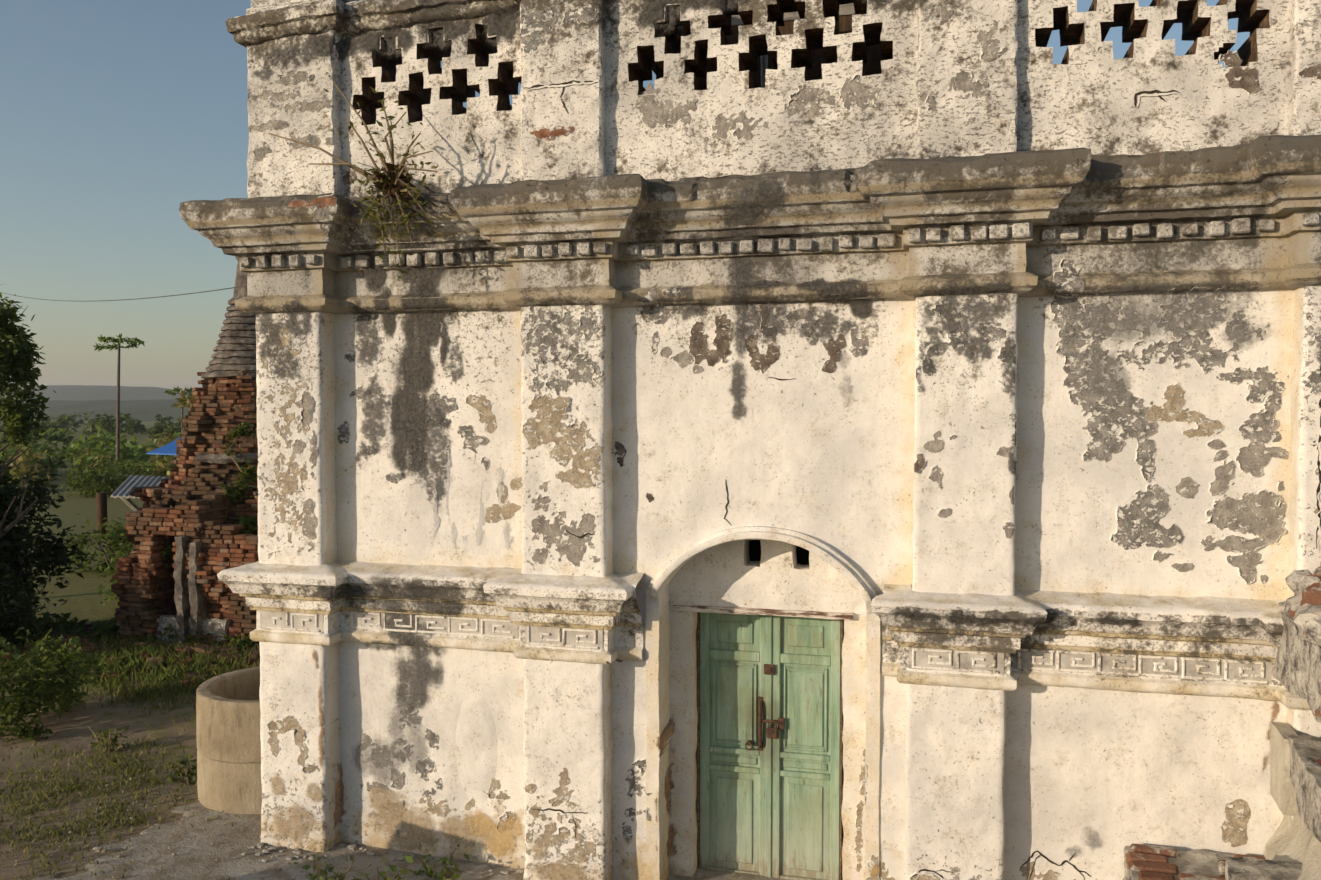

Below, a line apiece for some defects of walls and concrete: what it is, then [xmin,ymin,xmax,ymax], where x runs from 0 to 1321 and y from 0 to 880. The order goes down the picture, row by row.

water stain [349,180,485,548]
peeling [427,388,497,471]
peeling [485,291,628,567]
water stain [724,181,872,419]
peeling [1049,258,1321,585]
crack [1313,364,1321,552]
water stain [893,607,1058,627]
peeling [267,715,320,773]
water stain [321,578,521,856]
peeling [358,707,598,880]
crack [910,869,953,880]
crack [1020,850,1091,880]